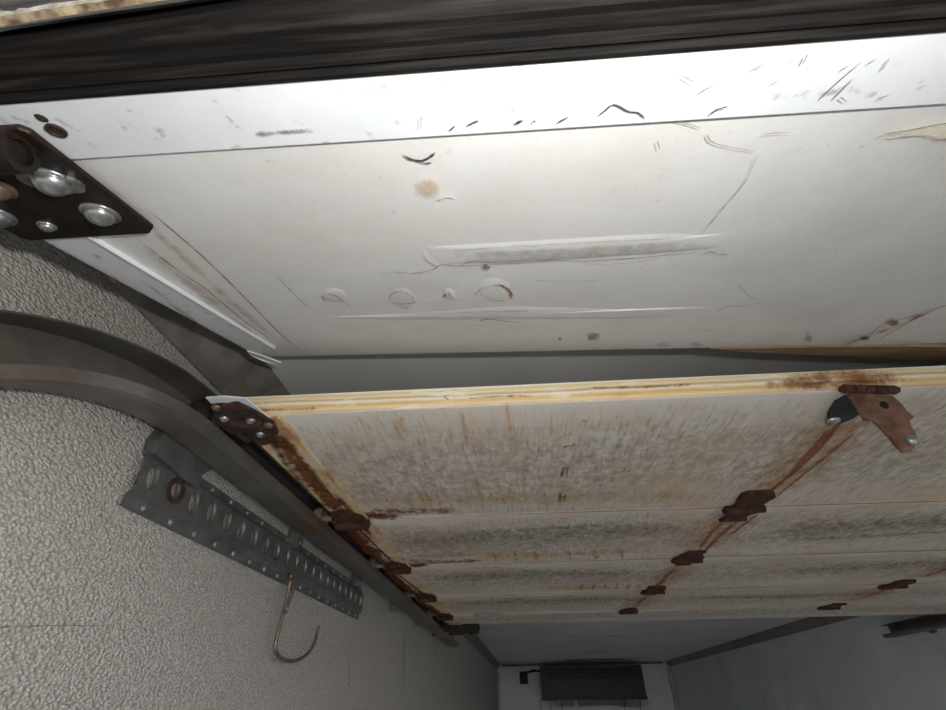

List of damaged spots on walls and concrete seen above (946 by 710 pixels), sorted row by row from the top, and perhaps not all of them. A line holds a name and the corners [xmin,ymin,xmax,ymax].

corrosion [769,370,895,390]
corrosion [766,420,940,507]
corrosion [271,435,507,614]
corrosion [519,507,756,558]